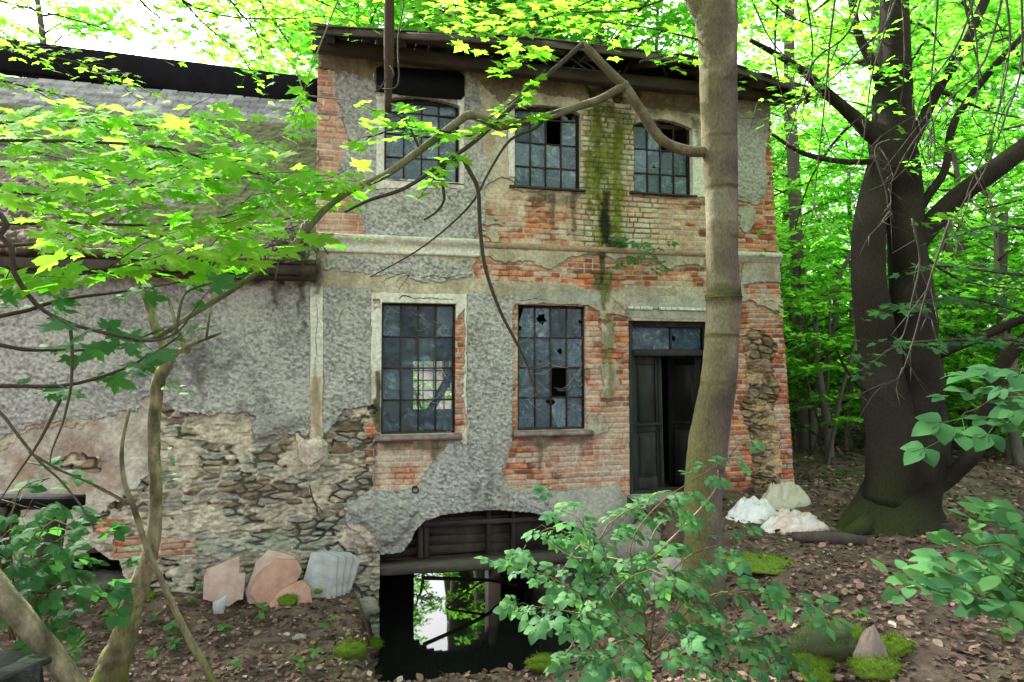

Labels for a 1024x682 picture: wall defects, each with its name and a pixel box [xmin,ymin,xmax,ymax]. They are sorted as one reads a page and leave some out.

flaking render [60,310,468,639]
flaking render [316,68,366,235]
flaking render [503,303,632,496]
leakage [532,87,631,392]
flaking render [471,93,707,293]
flaking render [724,123,795,491]